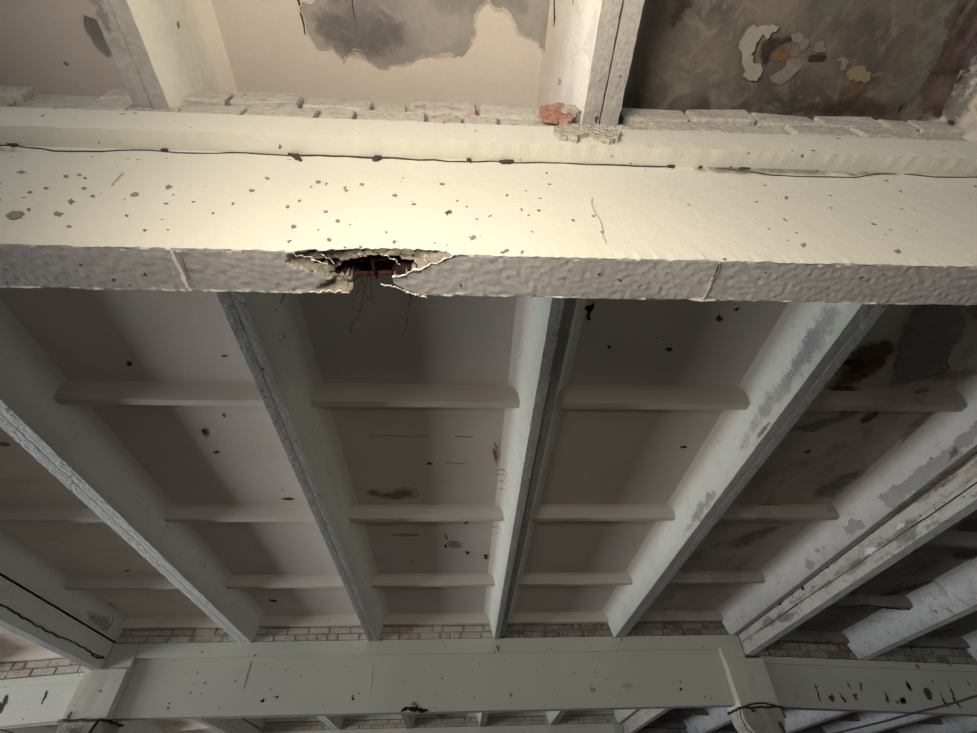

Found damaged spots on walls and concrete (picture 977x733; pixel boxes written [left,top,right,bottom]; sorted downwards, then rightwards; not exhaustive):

peeling [80,11,112,57]
peeling [297,0,555,70]
peeling [738,24,872,95]
hole [6,208,31,220]
spalling [287,224,455,333]
water stain [831,341,893,391]
peeling [894,304,966,385]
peeling [878,420,977,509]
peeling [957,519,977,532]
peeling [954,550,977,559]
spalling [815,682,862,703]
spalling [884,681,963,709]